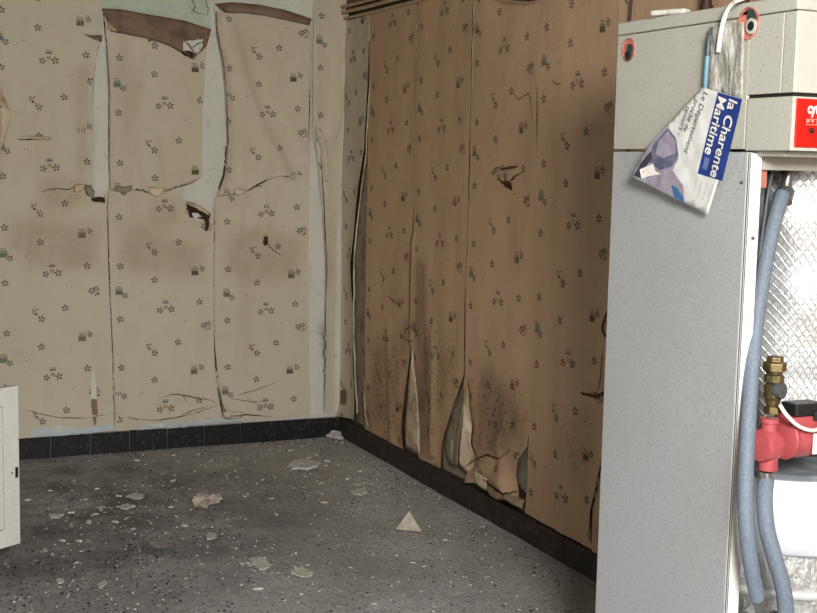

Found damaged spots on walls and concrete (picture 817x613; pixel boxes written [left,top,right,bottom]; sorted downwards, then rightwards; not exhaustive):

crack [28,0,276,430]
flaking render [90,0,314,218]